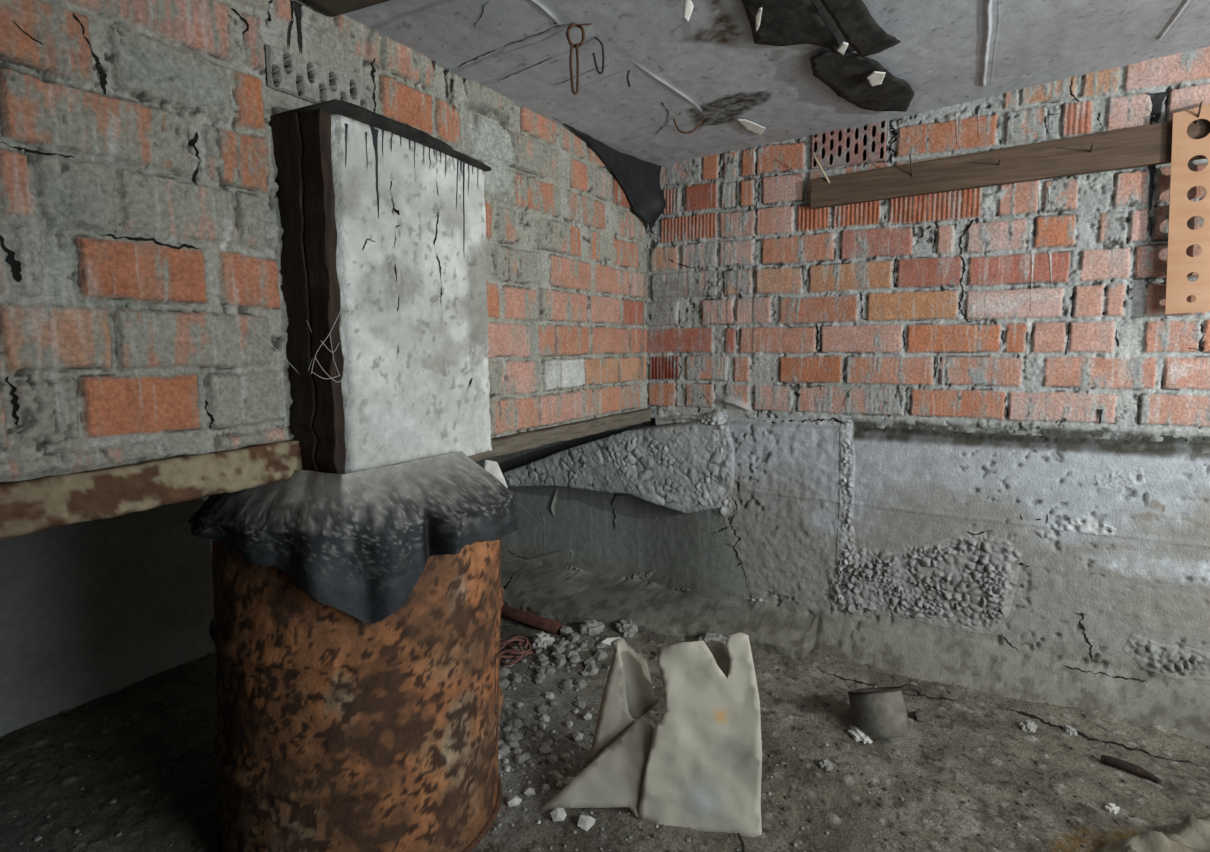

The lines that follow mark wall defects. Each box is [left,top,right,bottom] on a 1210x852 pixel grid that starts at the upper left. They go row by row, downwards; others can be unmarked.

crack [228,0,273,35]
crack [73,13,107,95]
spalling [867,71,886,87]
crack [3,142,75,158]
crack [188,132,201,185]
crack [0,235,22,282]
crack [97,233,199,249]
crack [6,376,20,425]
spalling [827,415,1022,635]
crack [1064,612,1147,682]
spalling [1122,633,1210,681]
crack [1007,708,1195,765]